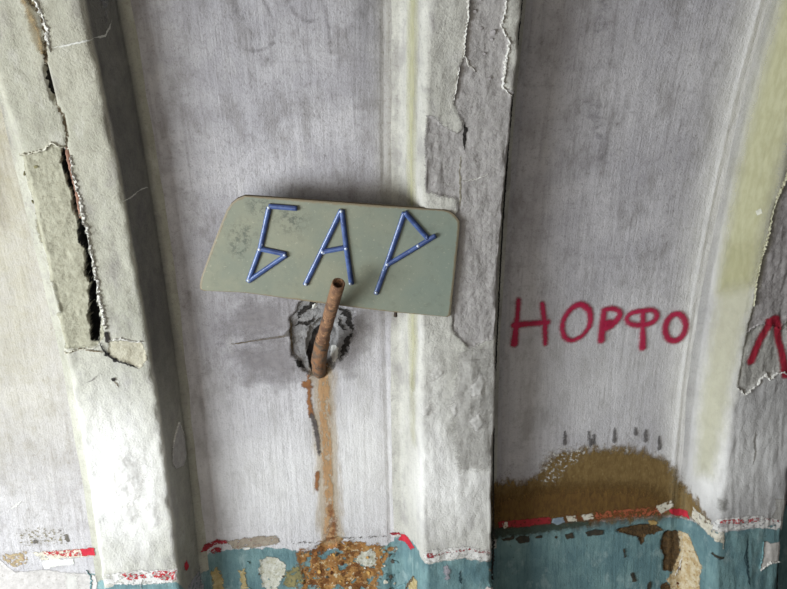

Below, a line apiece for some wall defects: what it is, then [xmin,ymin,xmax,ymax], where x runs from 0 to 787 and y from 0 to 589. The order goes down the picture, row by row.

crack [28,0,138,387]
spalling [424,0,514,349]
spalling [736,173,787,395]
spalling [289,301,326,376]
spalling [326,306,356,376]
rust [295,363,397,589]
peeling [0,547,97,589]
peeling [122,560,189,581]
peeling [238,557,304,589]